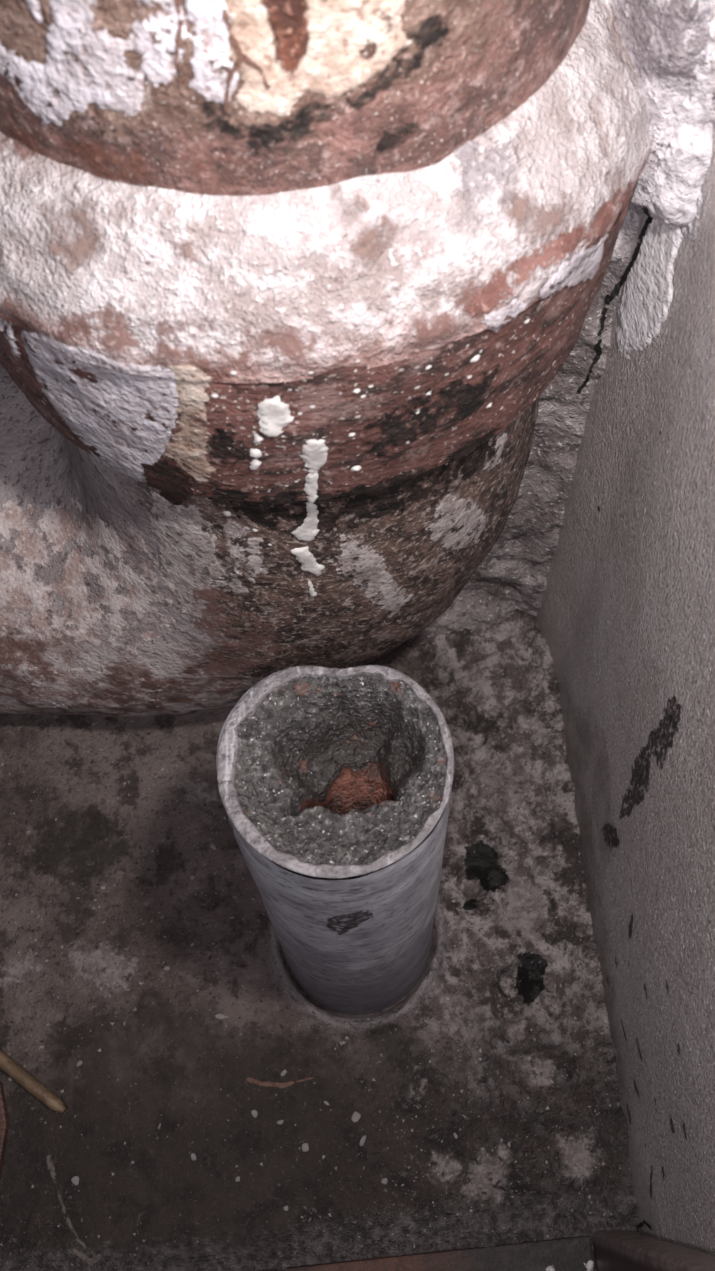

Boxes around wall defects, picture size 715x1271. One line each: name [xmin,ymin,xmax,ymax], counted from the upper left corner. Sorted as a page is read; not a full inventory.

peeling [0,0,412,126]
spalling [452,129,531,226]
peeling [481,234,608,333]
crack [577,208,653,393]
peeling [483,433,508,471]
peeling [0,318,228,710]
peeling [425,493,489,552]
peeling [327,528,414,618]